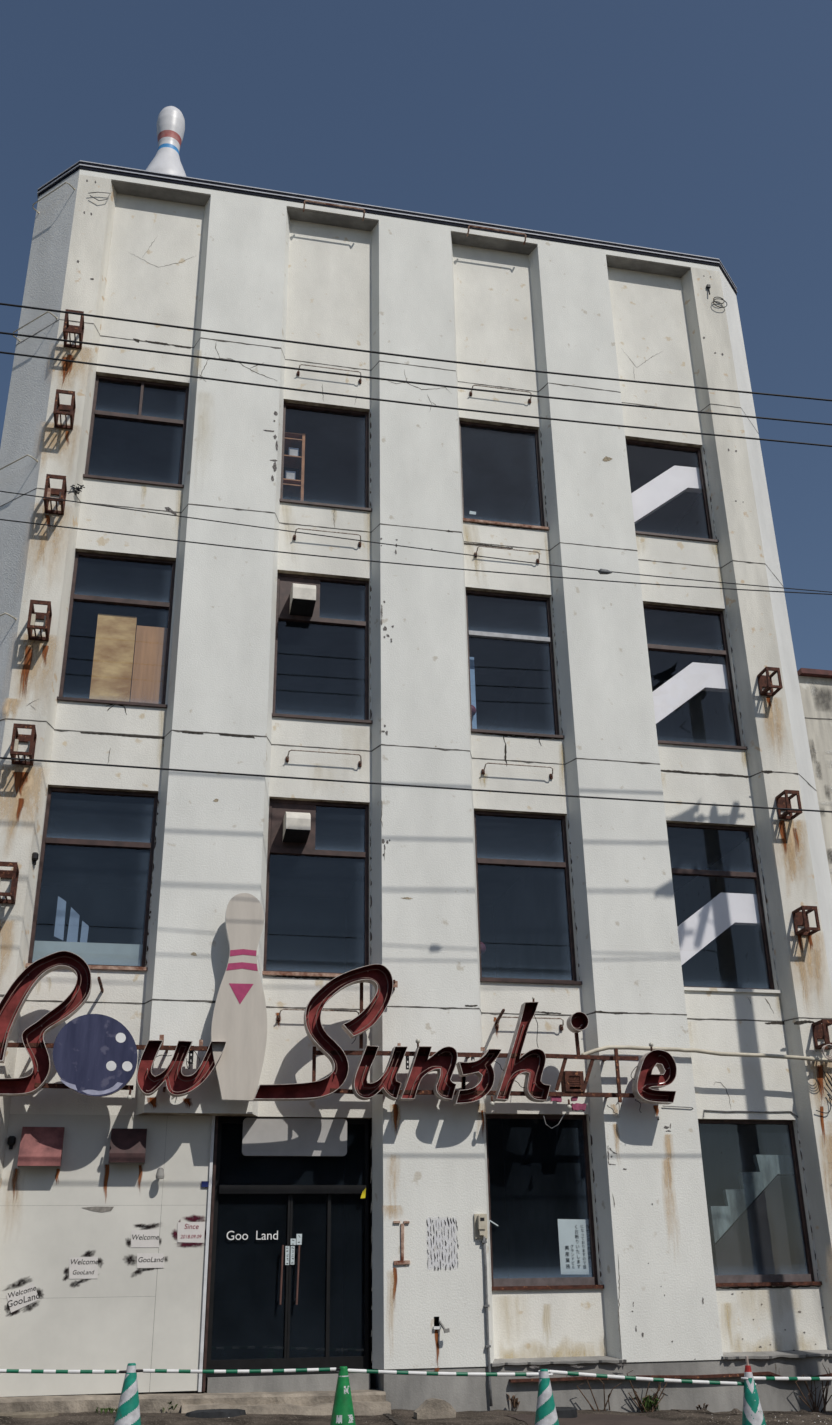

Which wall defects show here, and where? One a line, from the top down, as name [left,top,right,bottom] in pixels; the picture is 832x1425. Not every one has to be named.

corrosion [3,635,53,715]
corrosion [0,767,42,834]
corrosion [779,820,803,873]